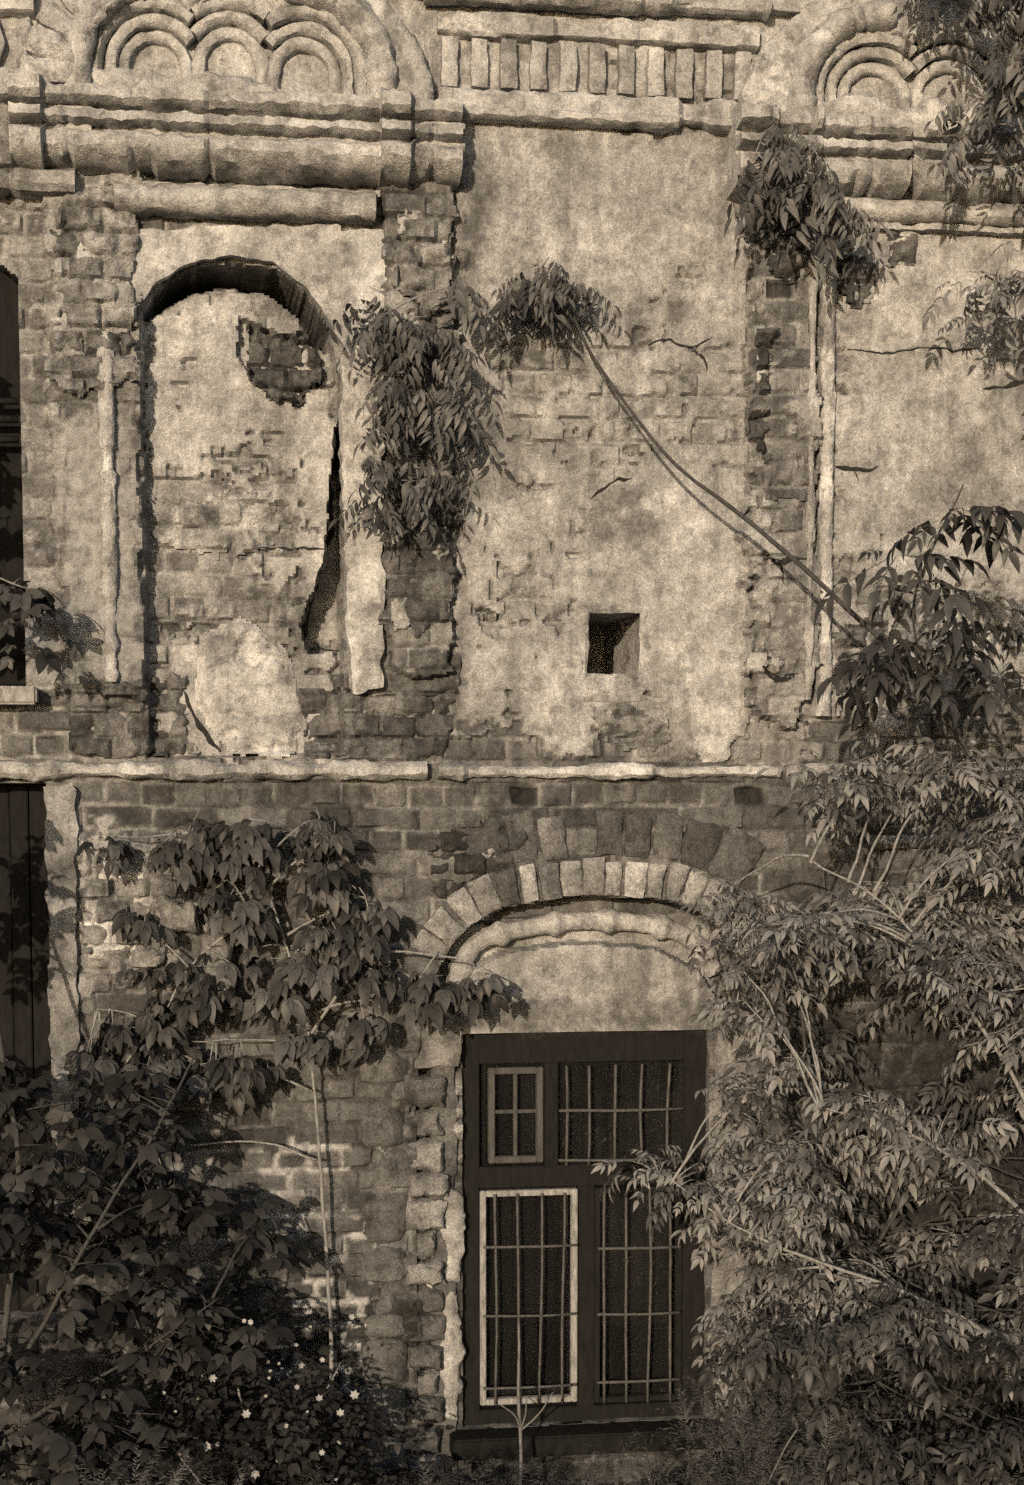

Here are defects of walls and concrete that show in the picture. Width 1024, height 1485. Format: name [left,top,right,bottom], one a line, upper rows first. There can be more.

flaking render [44,185,144,397]
flaking render [246,323,325,405]
flaking render [744,327,807,501]
flaking render [147,488,279,560]
crack [258,418,346,651]
crack [331,686,395,700]
flaking render [591,705,671,751]